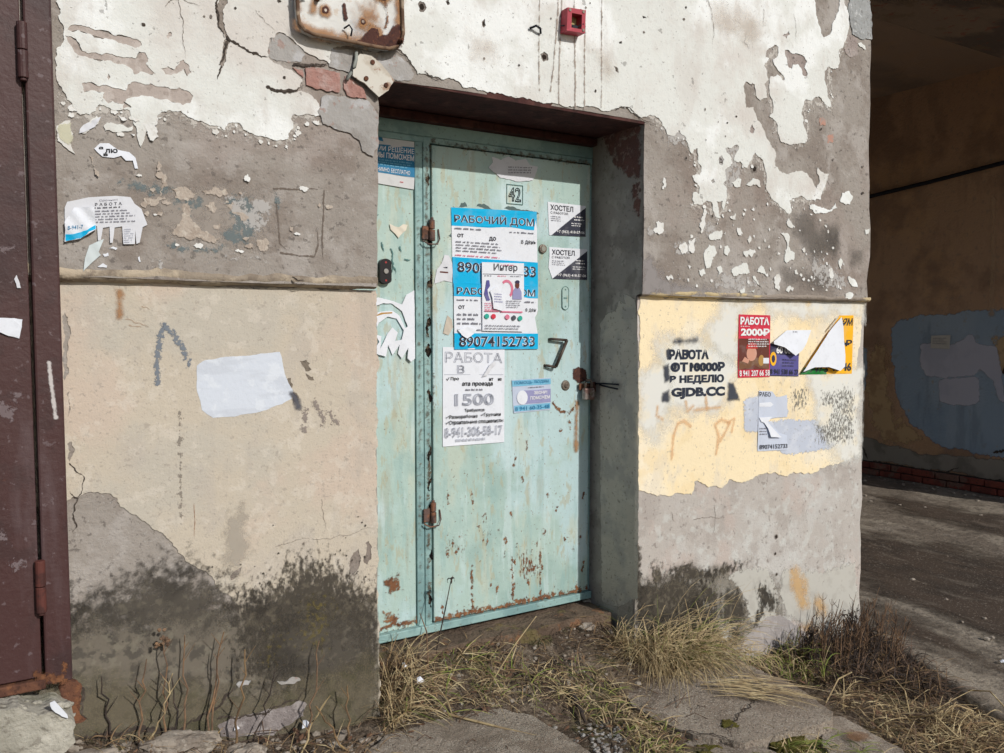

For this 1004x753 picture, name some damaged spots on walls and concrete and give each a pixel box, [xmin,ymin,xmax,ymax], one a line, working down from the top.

crack [167,0,266,78]
flaking render [57,33,414,157]
crack [266,63,329,93]
rust [296,0,404,50]
flaking render [754,0,873,149]
peeling [140,161,249,249]
peeling [602,115,844,291]
peeling [862,344,1004,481]
leakage [876,495,1004,536]
leakage [40,616,61,696]
leakage [69,513,380,741]
leakage [635,532,1004,672]